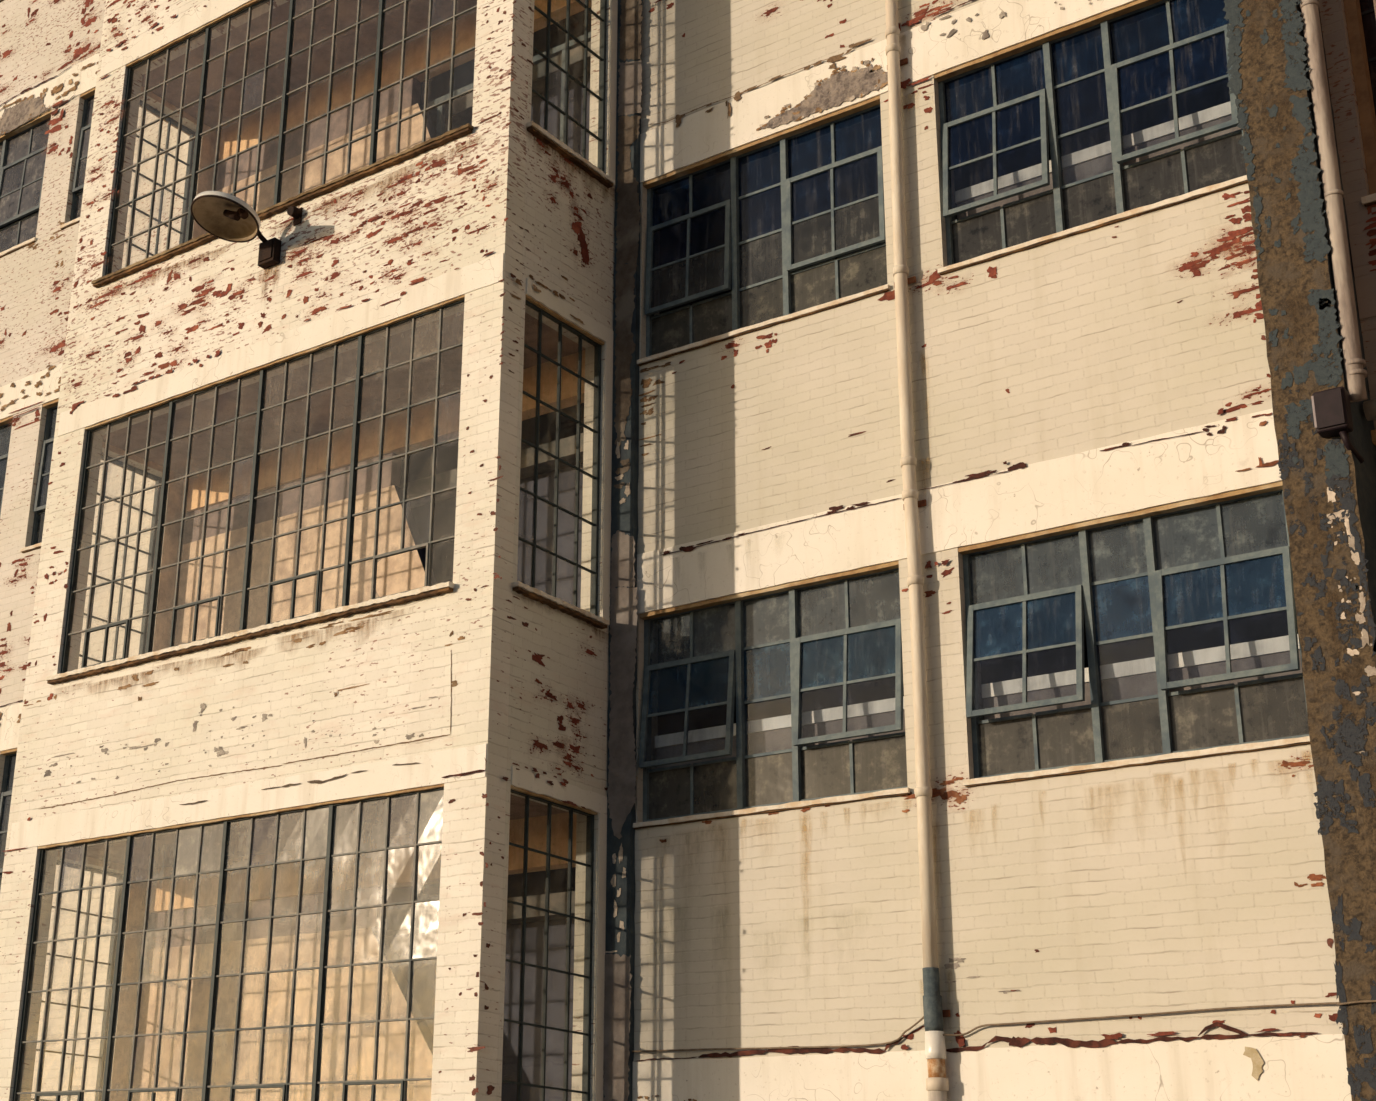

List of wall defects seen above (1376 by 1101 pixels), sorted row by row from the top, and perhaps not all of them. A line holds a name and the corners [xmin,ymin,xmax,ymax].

spalling [0,0,176,158]
peeling [0,97,596,430]
peeling [484,0,534,91]
spalling [614,0,685,504]
spalling [756,58,933,131]
peeling [1176,0,1331,347]
peeling [0,546,68,694]
peeling [1217,289,1376,835]
peeling [463,793,504,926]
spalling [497,530,659,1101]
peeling [469,1075,495,1096]
crack [637,1022,1317,1062]